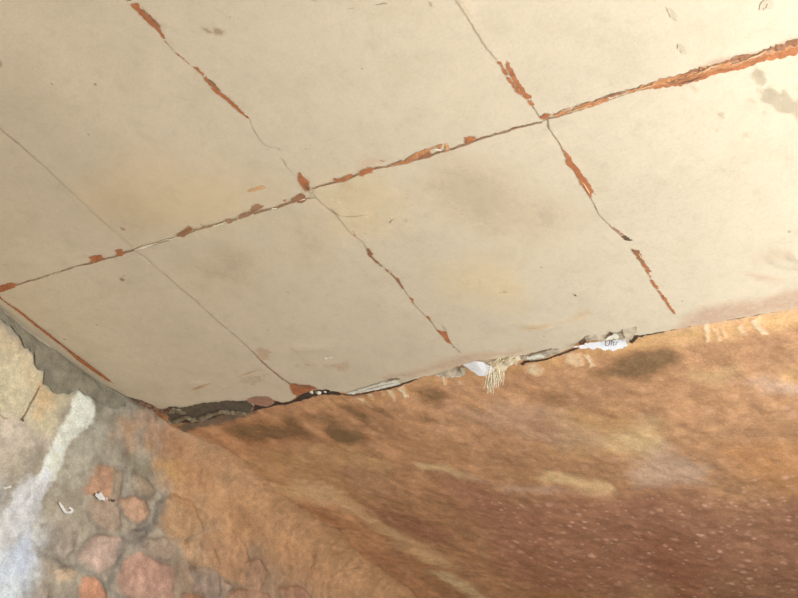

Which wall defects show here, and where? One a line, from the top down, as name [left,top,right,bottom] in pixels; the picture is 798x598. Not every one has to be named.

crack [0,0,798,384]
crack [0,386,41,421]
spalling [139,397,275,425]
peeling [290,384,317,396]